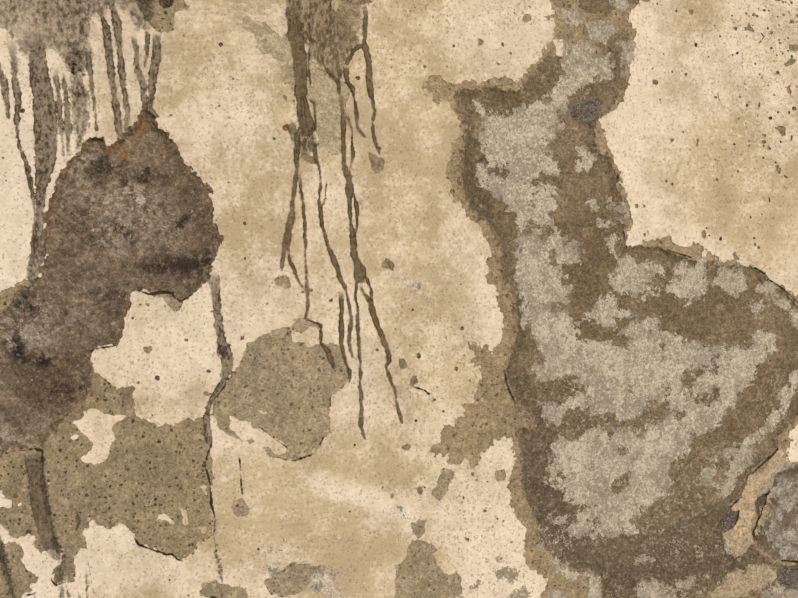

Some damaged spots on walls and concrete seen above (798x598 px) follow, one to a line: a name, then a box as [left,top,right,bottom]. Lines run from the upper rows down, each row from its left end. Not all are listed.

leakage [0,0,162,283]
leakage [280,0,403,439]
spalling [394,0,798,598]
leakage [0,544,15,596]
leakage [25,460,60,557]
crack [205,444,215,515]